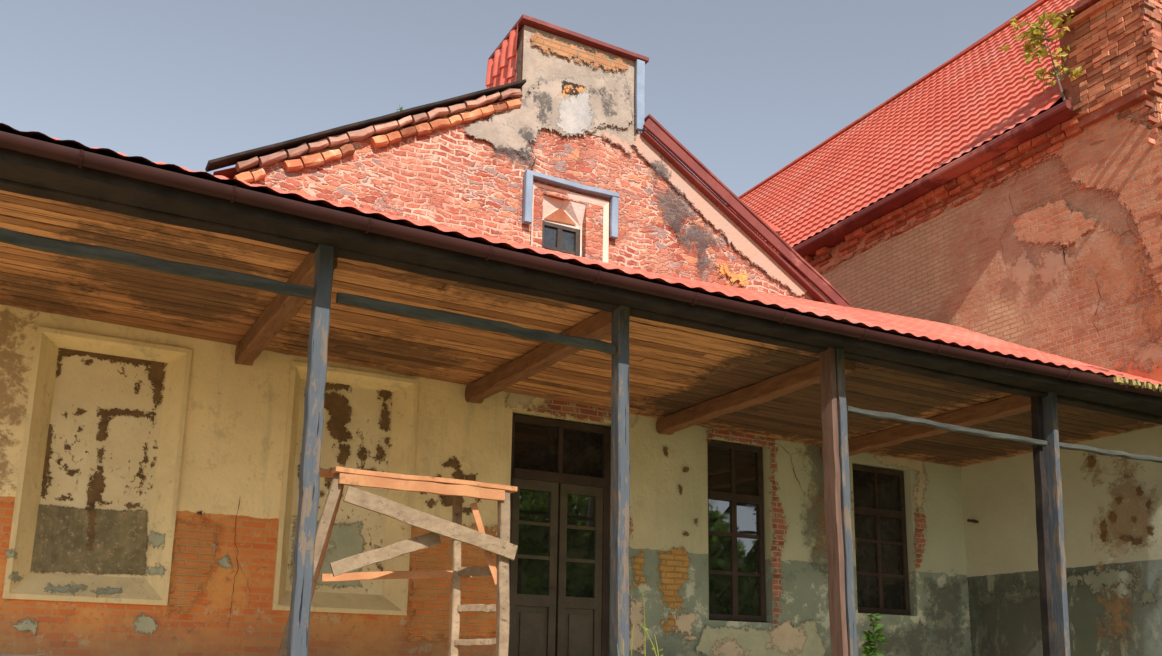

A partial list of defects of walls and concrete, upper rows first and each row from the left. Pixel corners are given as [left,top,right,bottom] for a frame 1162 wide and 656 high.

spalling [559,80,586,97]
flaking render [529,29,630,72]
peeling [40,348,166,510]
peeling [319,382,392,498]
crack [228,500,251,625]
peeling [629,585,647,654]
peeling [658,428,827,656]
peeling [1099,475,1154,547]